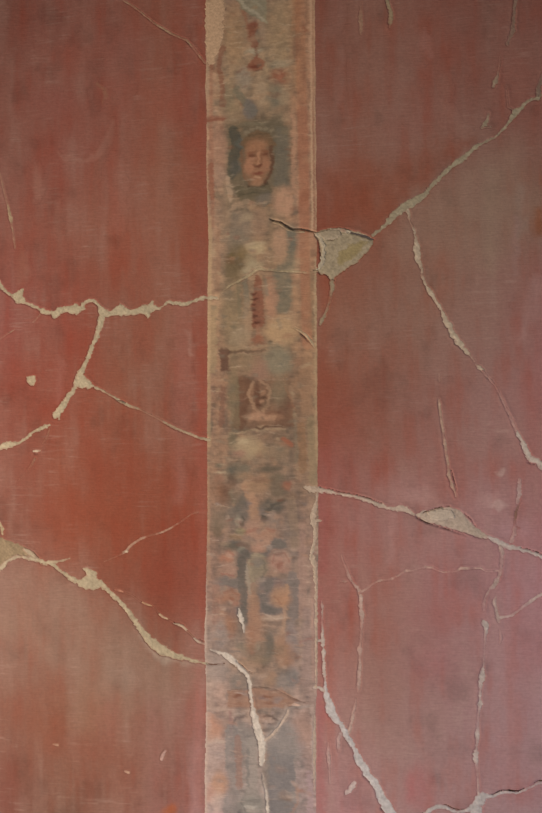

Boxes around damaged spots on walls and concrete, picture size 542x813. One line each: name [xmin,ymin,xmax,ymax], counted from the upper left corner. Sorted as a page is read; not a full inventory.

peeling [204,0,226,65]
spalling [314,227,374,281]
crack [371,0,542,470]
crack [0,267,335,481]
crack [318,373,457,516]
spalling [415,507,487,539]
crack [36,511,542,813]